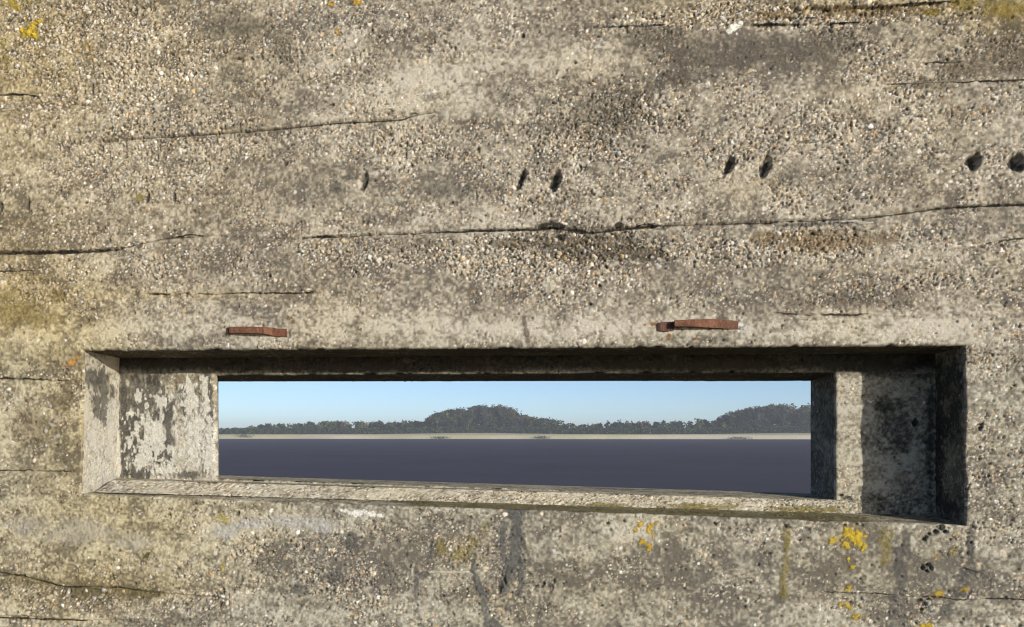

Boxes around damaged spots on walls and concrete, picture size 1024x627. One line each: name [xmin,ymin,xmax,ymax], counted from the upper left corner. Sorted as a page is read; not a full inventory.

crack [179,112,431,137]
crack [305,204,1024,240]
crack [0,246,132,273]
leakage [91,373,200,479]
leakage [499,509,526,598]